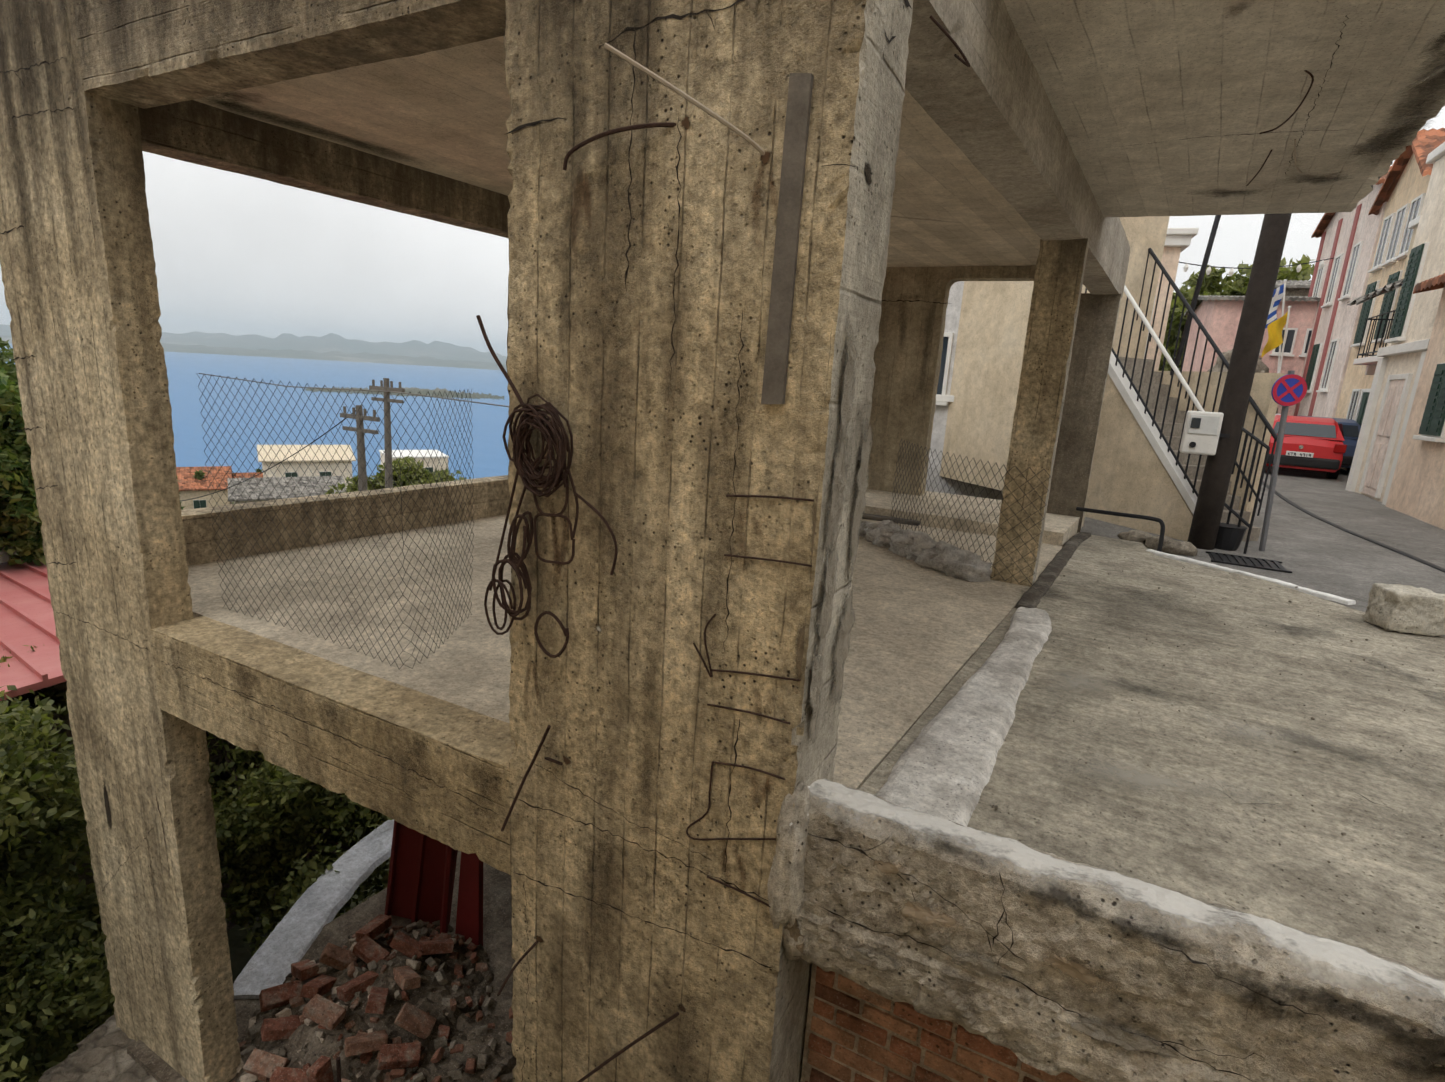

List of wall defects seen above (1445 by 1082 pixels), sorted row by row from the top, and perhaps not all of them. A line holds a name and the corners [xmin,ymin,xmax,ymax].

crack [883,0,912,43]
crack [598,0,745,292]
leakage [1354,35,1445,161]
crack [670,118,682,377]
leakage [1300,993,1445,1076]